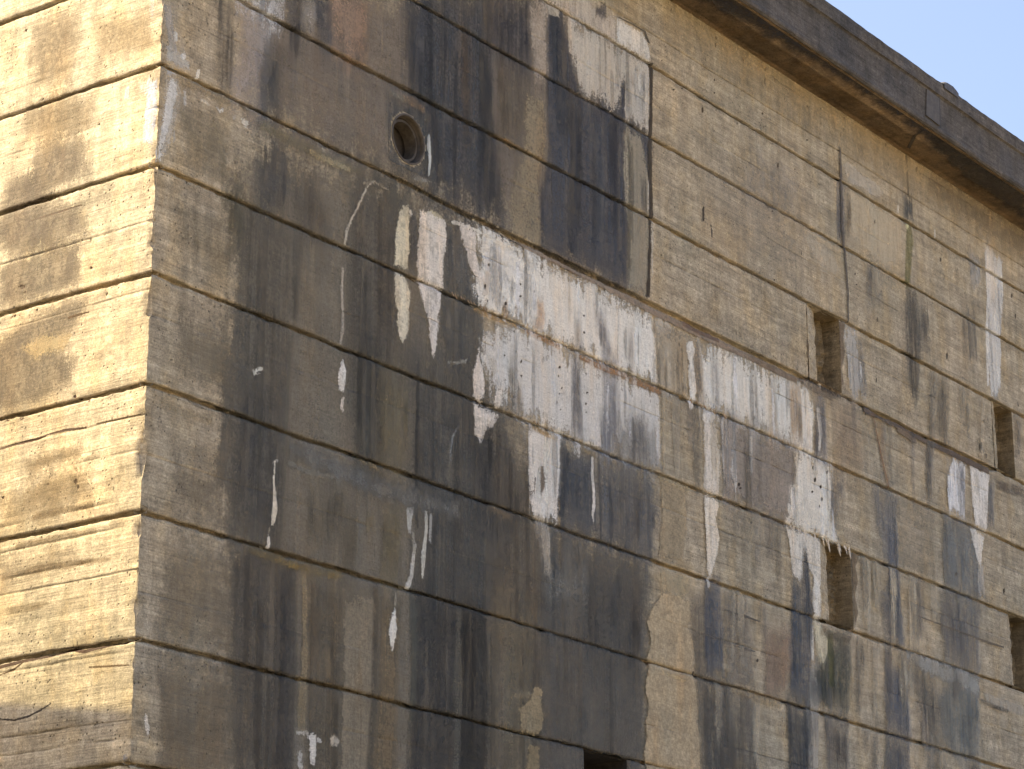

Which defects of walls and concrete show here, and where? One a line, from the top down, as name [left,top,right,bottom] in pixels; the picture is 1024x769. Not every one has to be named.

crack [835,147,849,323]
water stain [153,0,859,769]
water stain [963,247,1003,396]
water stain [868,503,921,637]
water stain [943,460,993,598]
water stain [887,659,978,755]